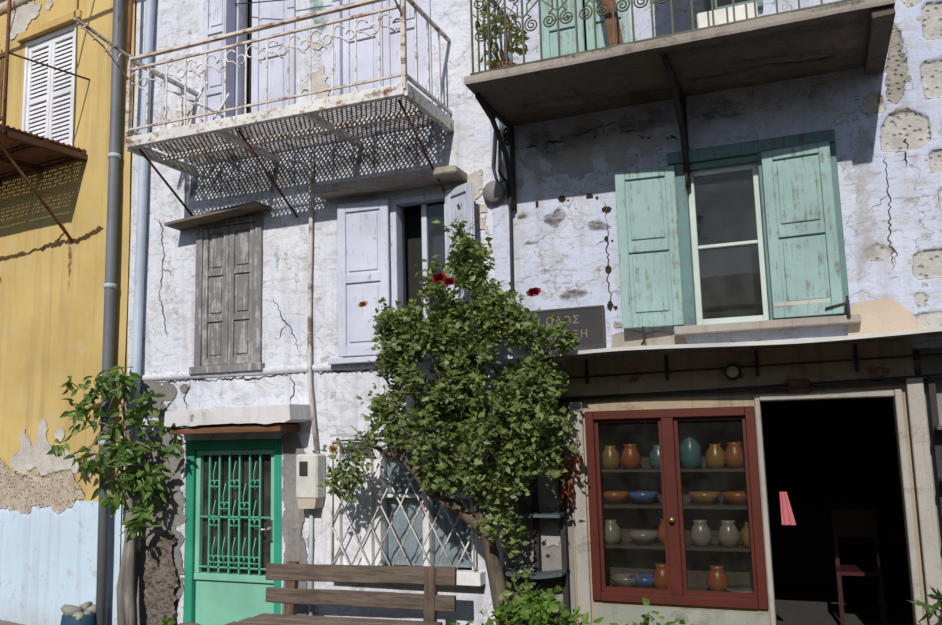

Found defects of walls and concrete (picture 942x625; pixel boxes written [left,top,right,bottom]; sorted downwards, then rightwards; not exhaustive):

peeling [4,0,53,41]
flaking render [904,0,942,39]
flaking render [854,23,942,261]
water stain [544,209,565,226]
crack [872,139,909,266]
flaking render [908,248,942,279]
flaking render [915,292,942,334]
spalling [0,418,96,513]